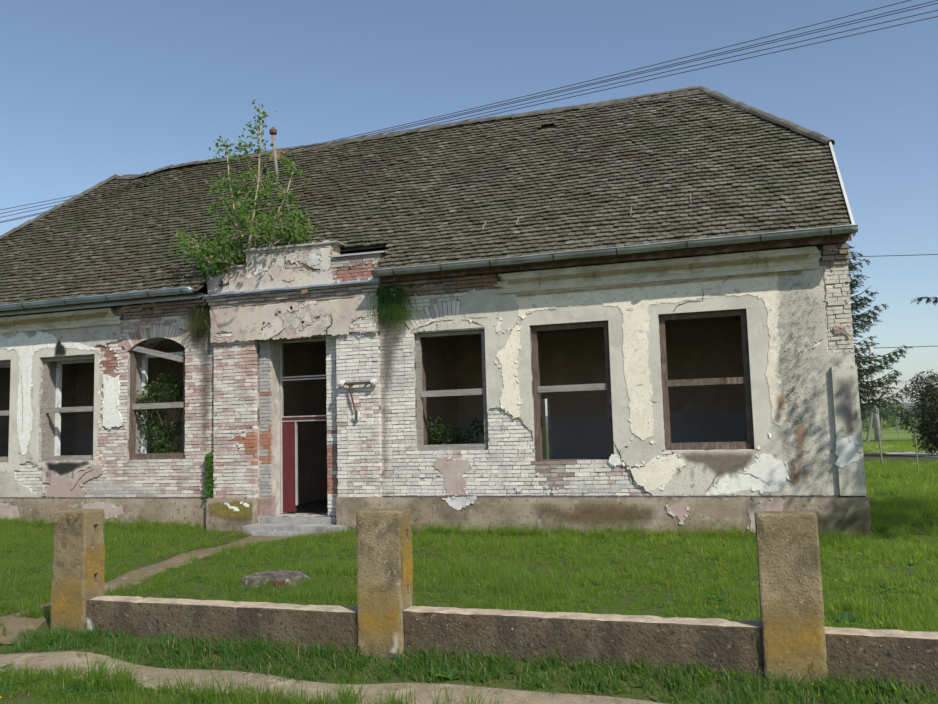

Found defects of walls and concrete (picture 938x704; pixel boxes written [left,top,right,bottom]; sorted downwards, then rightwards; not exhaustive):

peeling [241,247,378,283]
peeling [258,303,333,338]
spalling [801,266,854,353]
water stain [509,254,826,482]
peeling [460,279,792,533]
water stain [842,383,852,426]
peeling [0,344,123,521]
spalling [229,424,272,465]
flaking render [432,456,477,508]